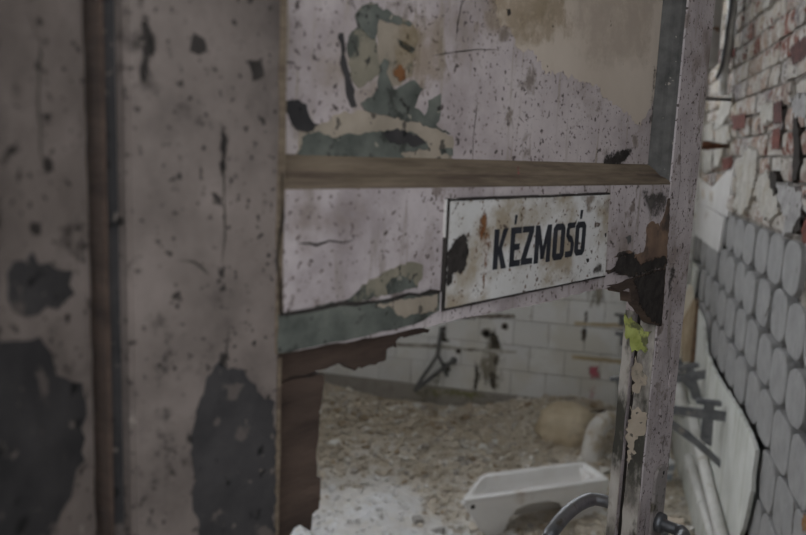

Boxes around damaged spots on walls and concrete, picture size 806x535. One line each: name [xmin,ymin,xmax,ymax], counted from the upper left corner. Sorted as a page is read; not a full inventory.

spalling [790,36,806,65]
peeling [0,337,87,535]
peeling [190,361,278,535]
peeling [625,406,648,464]